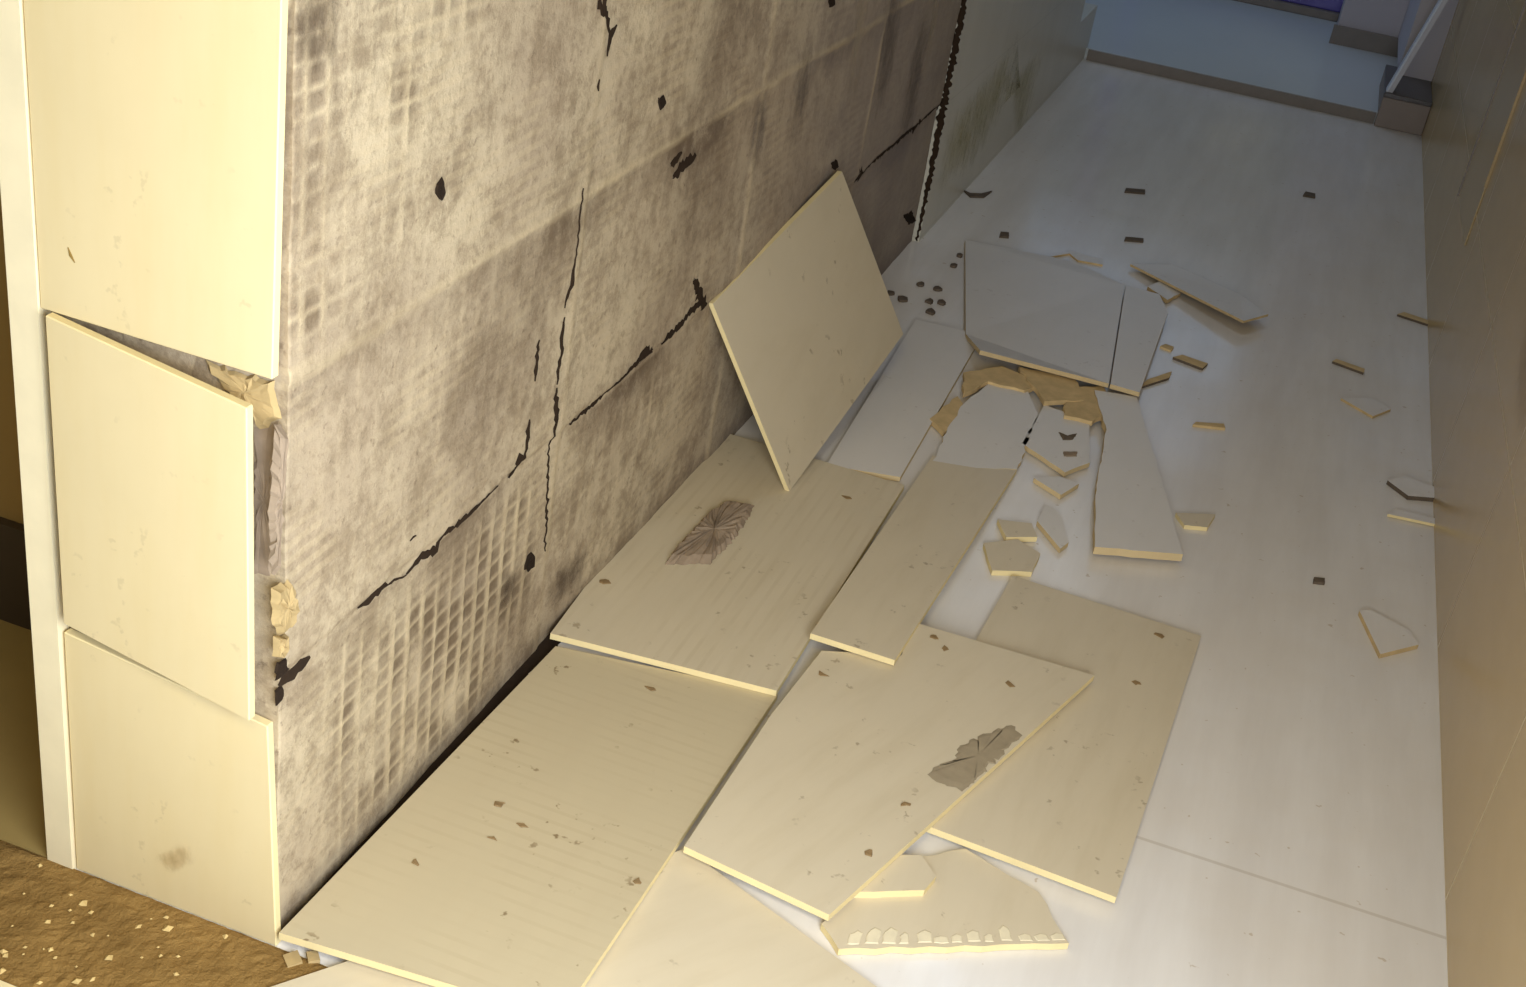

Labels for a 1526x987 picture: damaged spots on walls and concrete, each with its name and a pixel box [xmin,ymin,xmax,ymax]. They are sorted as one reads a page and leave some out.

crack [597,0,617,91]
spalling [670,151,697,179]
spalling [435,177,446,201]
spalling [903,210,916,225]
crack [357,188,708,609]
spalling [524,552,535,572]
crack [278,655,311,688]